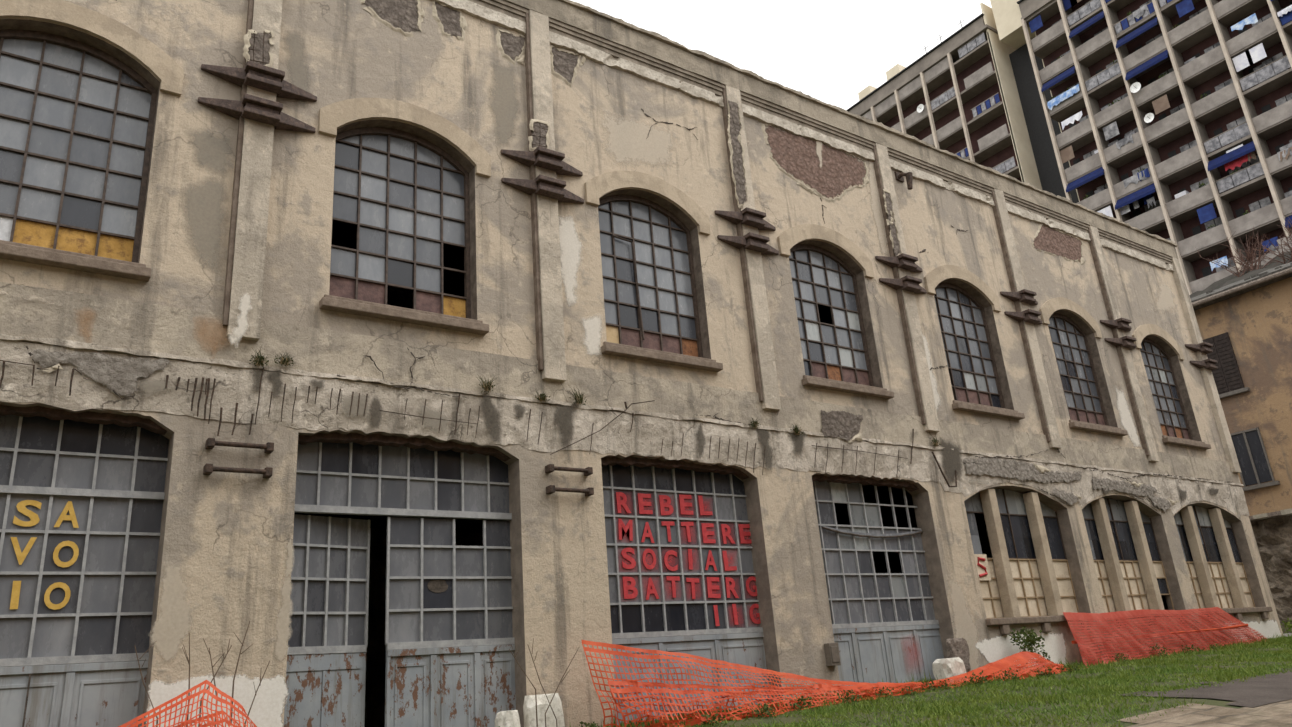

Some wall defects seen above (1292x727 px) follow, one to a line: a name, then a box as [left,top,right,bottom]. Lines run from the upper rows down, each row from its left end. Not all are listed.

spalling [360,0,468,41]
spalling [550,44,586,87]
spalling [727,100,747,209]
spalling [761,123,902,255]
spalling [0,346,480,438]
leakage [254,370,282,396]
leakage [340,395,381,428]
spalling [963,457,1179,511]